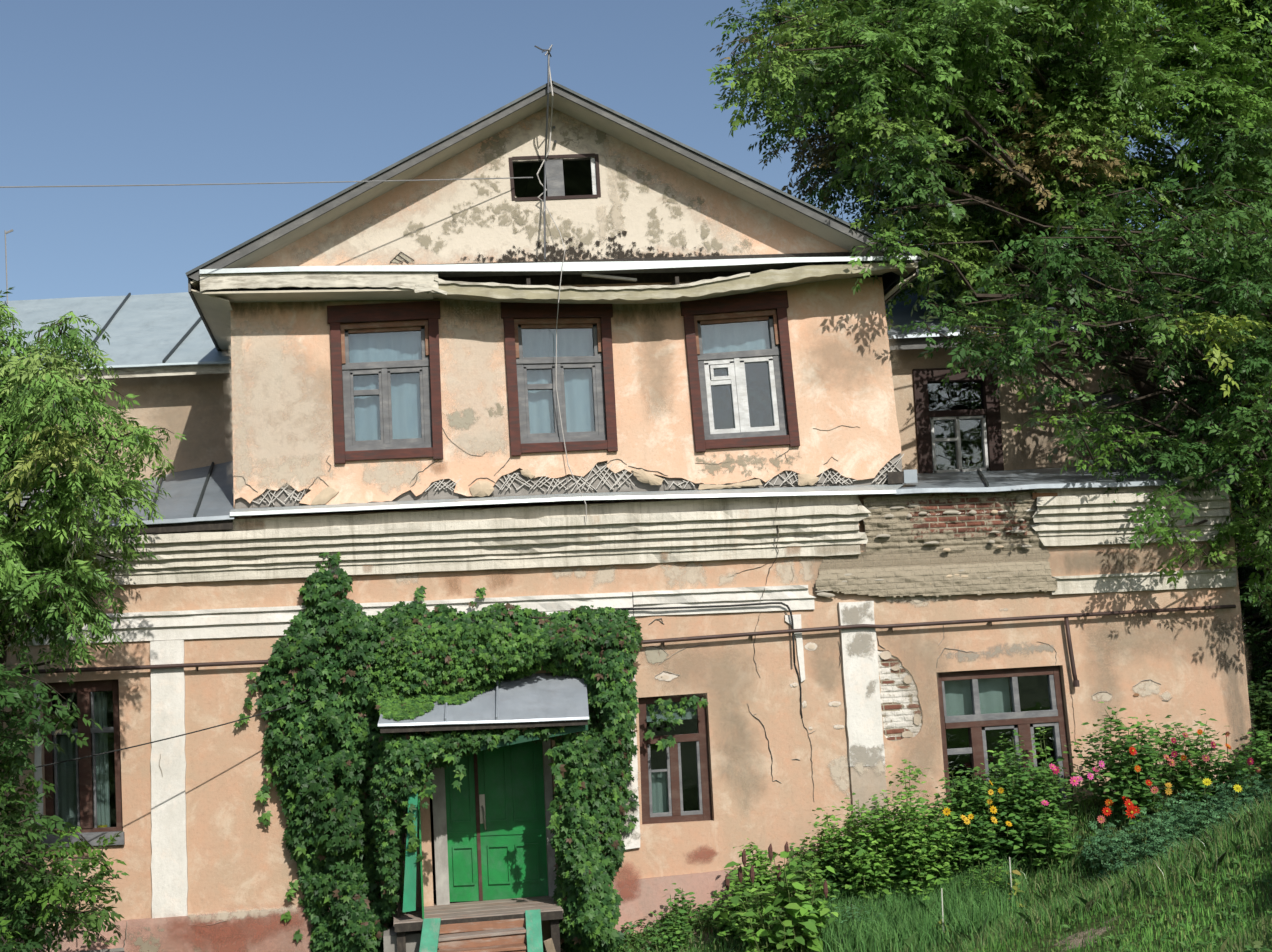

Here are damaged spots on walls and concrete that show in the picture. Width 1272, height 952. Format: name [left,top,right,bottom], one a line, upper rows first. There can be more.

peeling [298,112,752,264]
peeling [363,462,461,500]
flaking render [493,464,637,497]
flaking render [664,478,695,490]
peeling [696,451,799,487]
flaking render [814,454,918,485]
crack [727,499,794,676]
spalling [828,602,922,796]
peeling [1133,679,1172,701]
crack [748,705,842,799]
leakage [188,906,297,923]